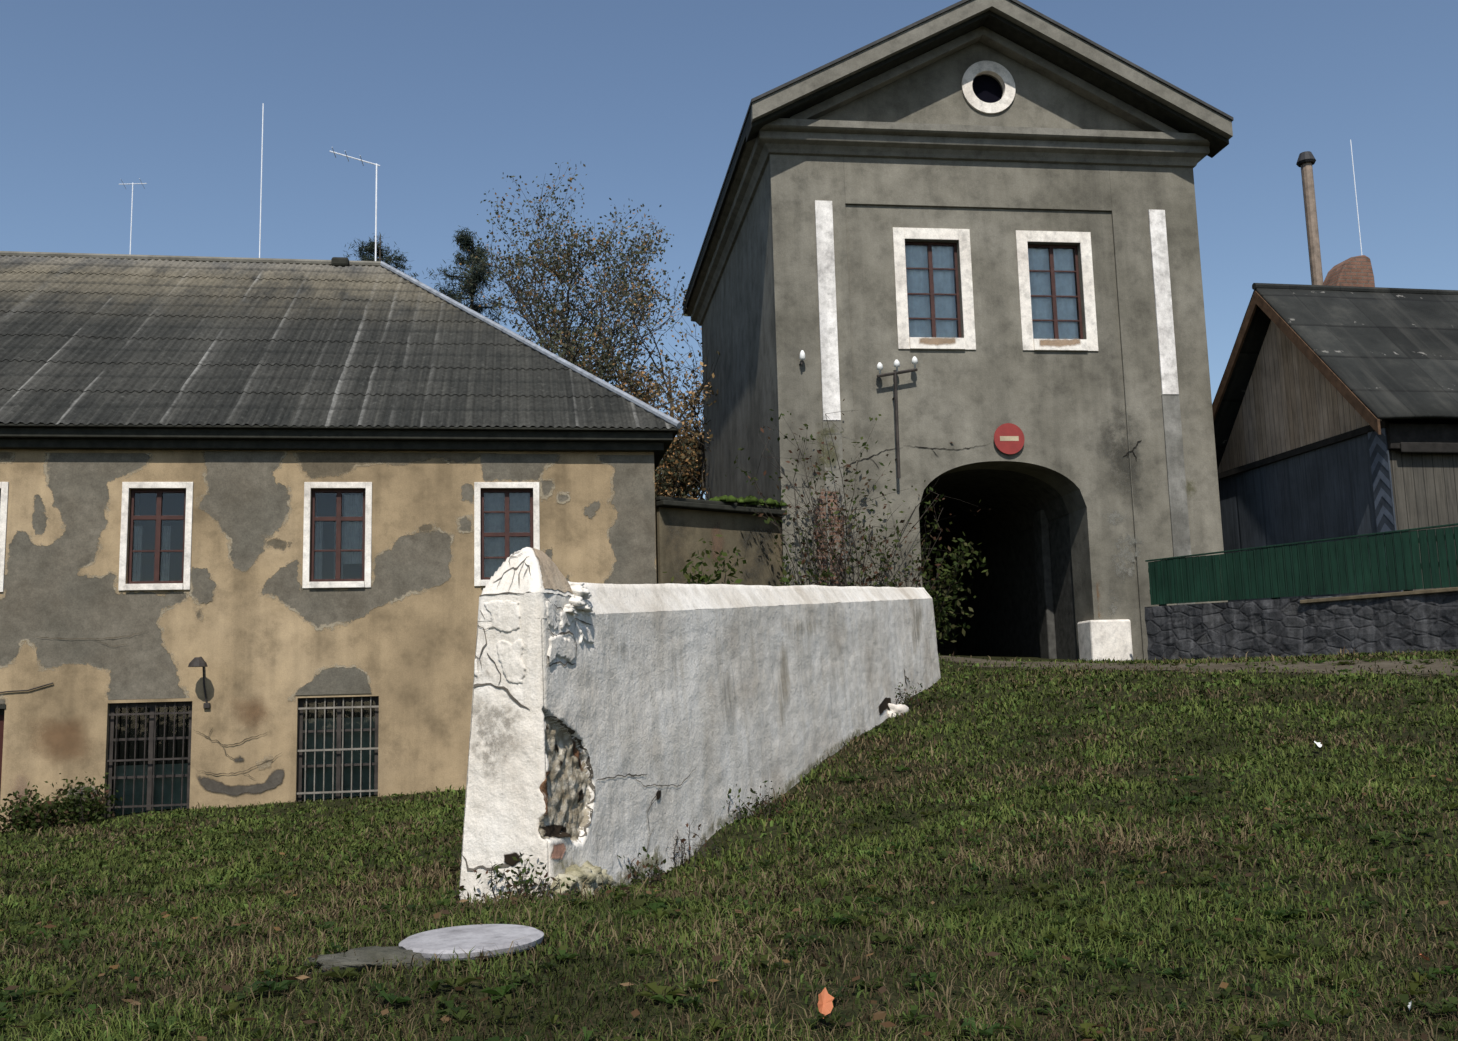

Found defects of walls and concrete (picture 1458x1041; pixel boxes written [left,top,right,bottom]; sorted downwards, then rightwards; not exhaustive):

flaking render [0,452,216,700]
flaking render [287,664,372,700]
flaking render [198,451,656,665]
flaking render [484,600,526,684]
crack [474,551,591,710]
flaking render [538,708,616,900]
crack [596,767,697,850]